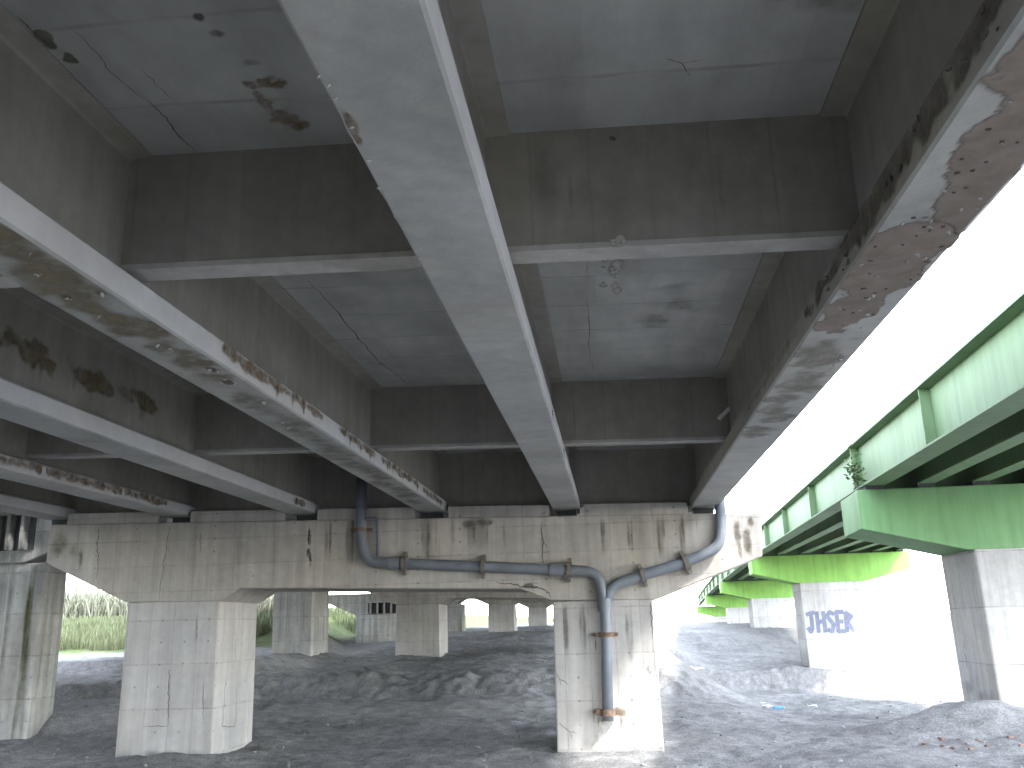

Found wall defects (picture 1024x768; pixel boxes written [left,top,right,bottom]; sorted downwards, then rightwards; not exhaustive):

crack [75,32,194,150]
corrosion [243,78,309,130]
peeling [804,0,1024,334]
peeling [0,226,238,385]
crack [308,281,408,385]
corrosion [77,368,157,414]
corrosion [0,456,167,505]
crack [496,521,551,599]
water stain [734,518,753,554]